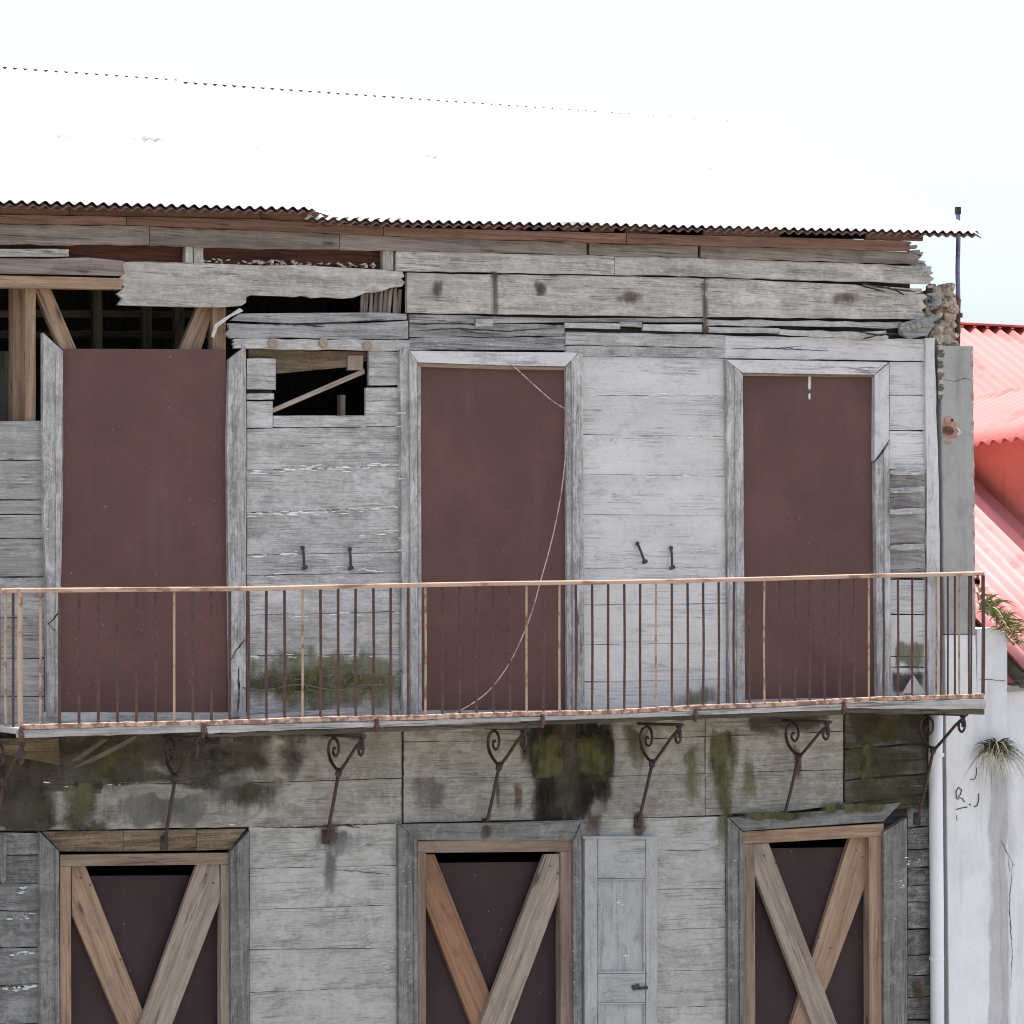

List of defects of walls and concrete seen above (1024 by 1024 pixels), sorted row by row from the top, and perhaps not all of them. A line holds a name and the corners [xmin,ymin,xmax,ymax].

water stain [0,729,325,831]
water stain [521,721,615,836]
water stain [710,731,755,838]
crack [1001,841,1015,978]